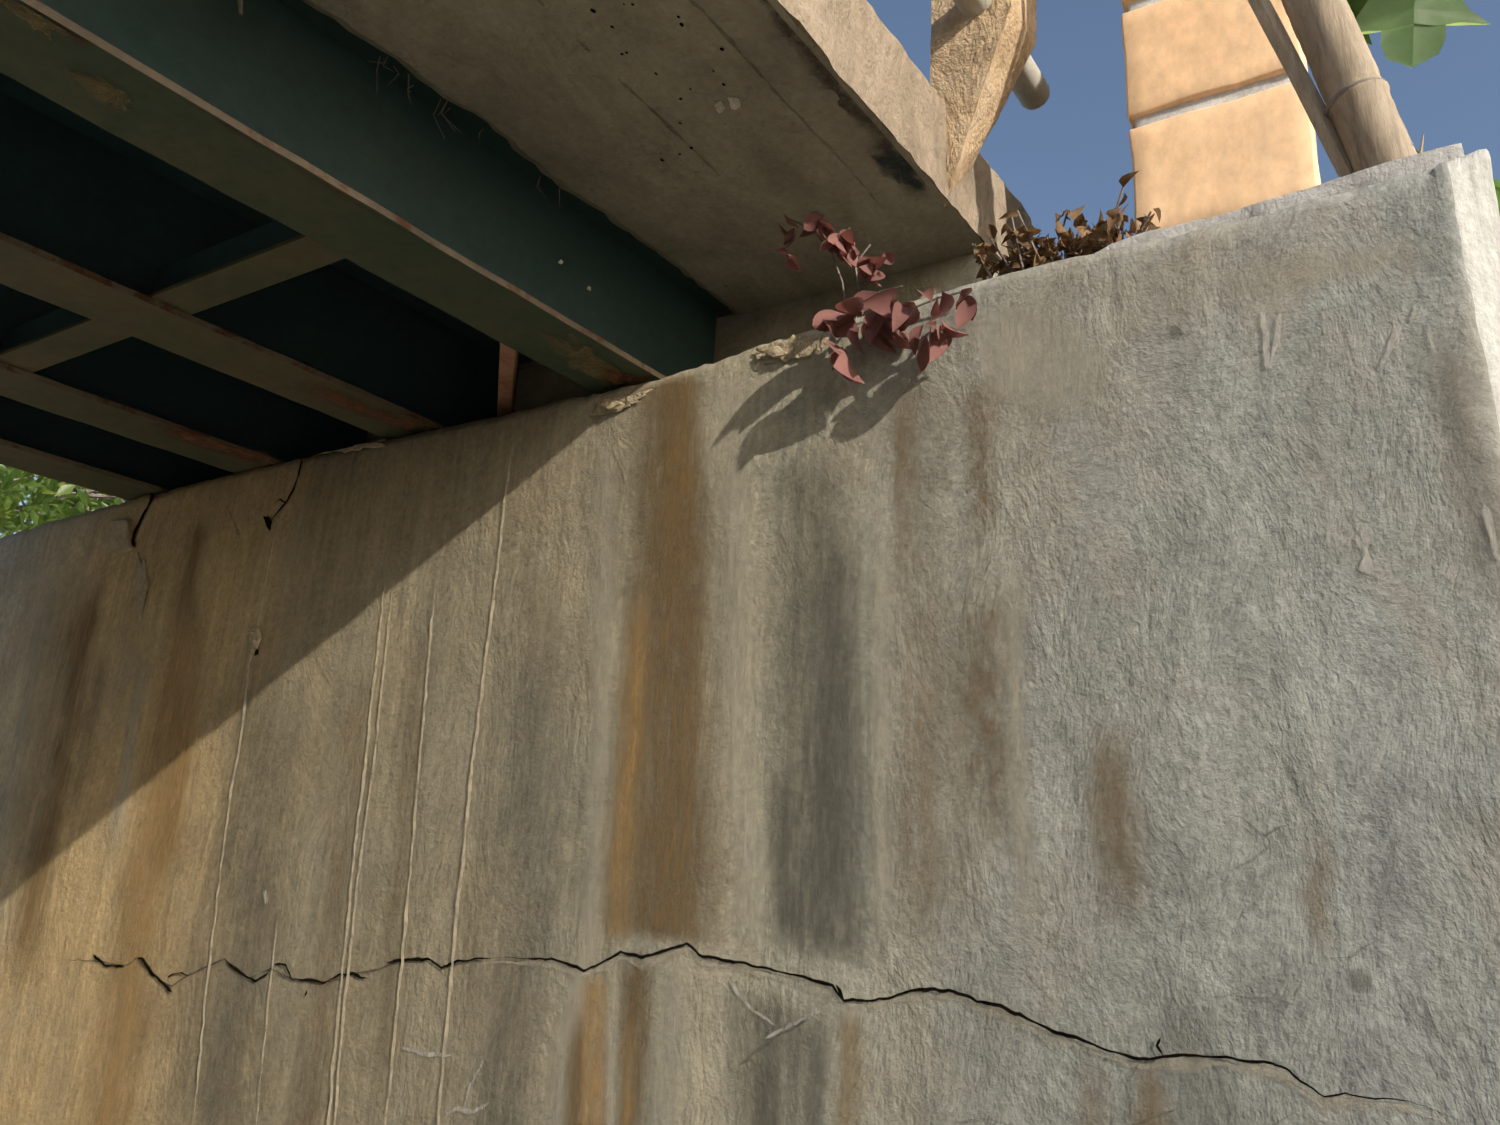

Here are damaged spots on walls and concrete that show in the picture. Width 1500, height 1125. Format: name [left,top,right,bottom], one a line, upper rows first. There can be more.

crack [101,494,154,624]
crack [263,458,302,531]
rust [613,380,705,938]
rust [625,968,646,1125]
crack [70,942,1461,1121]